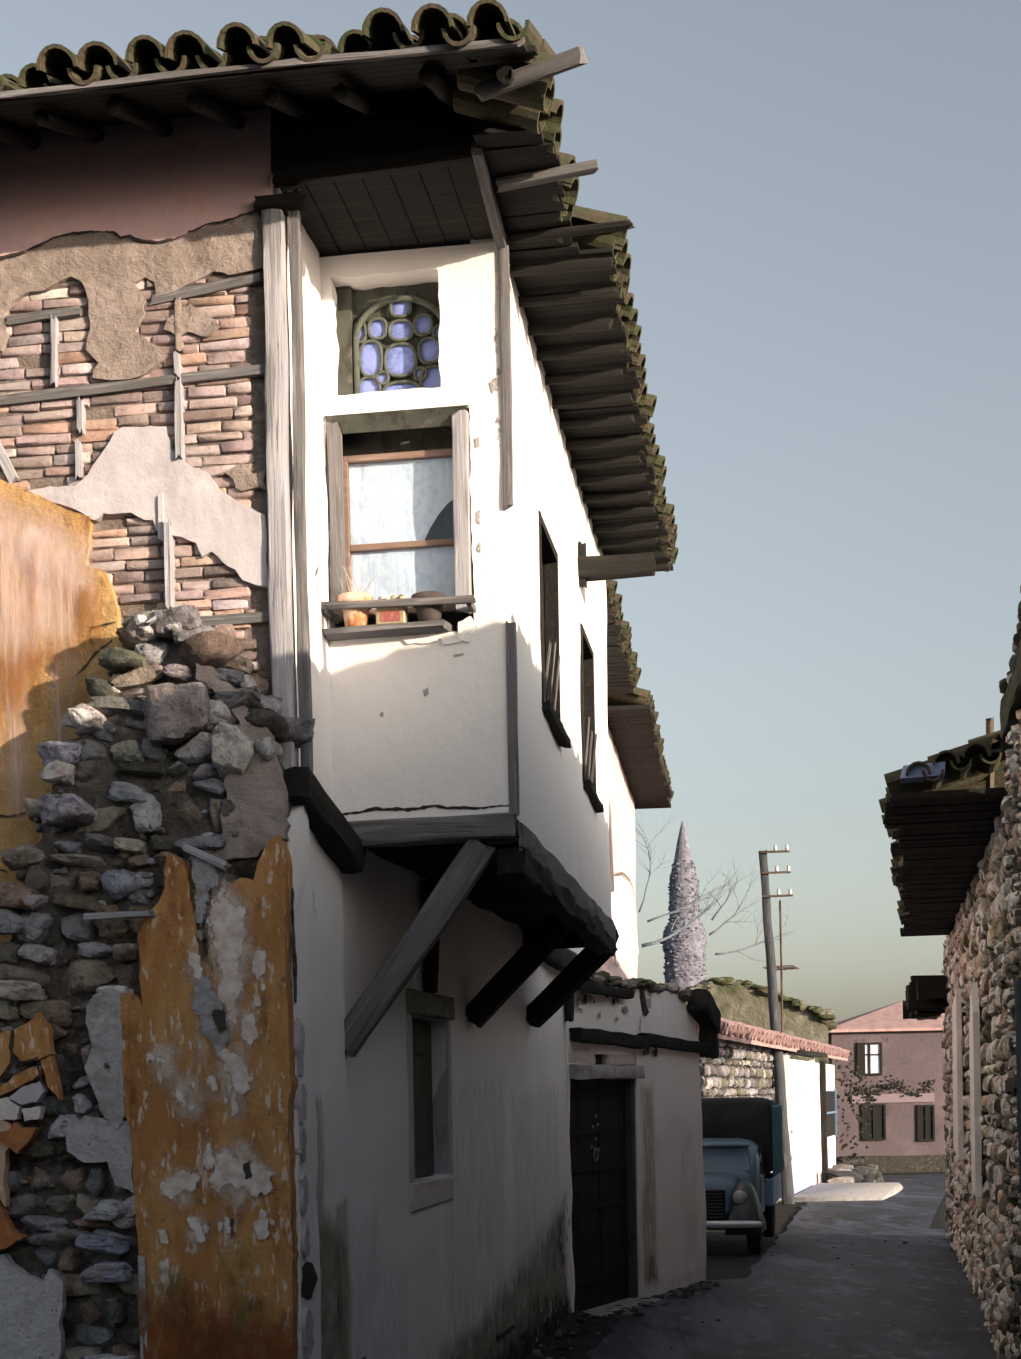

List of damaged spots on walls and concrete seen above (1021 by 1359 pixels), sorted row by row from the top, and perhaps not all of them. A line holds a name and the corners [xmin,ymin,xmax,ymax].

flaking render [0,211,269,677]
leakage [0,543,24,813]
efflorescence [53,564,73,742]
crack [0,810,27,818]
flaking render [146,855,266,1118]
flaking render [0,1013,67,1359]
flaking render [158,1229,170,1291]
flaking render [159,1140,275,1243]
leakage [316,1101,351,1359]
leakage [445,1212,571,1359]